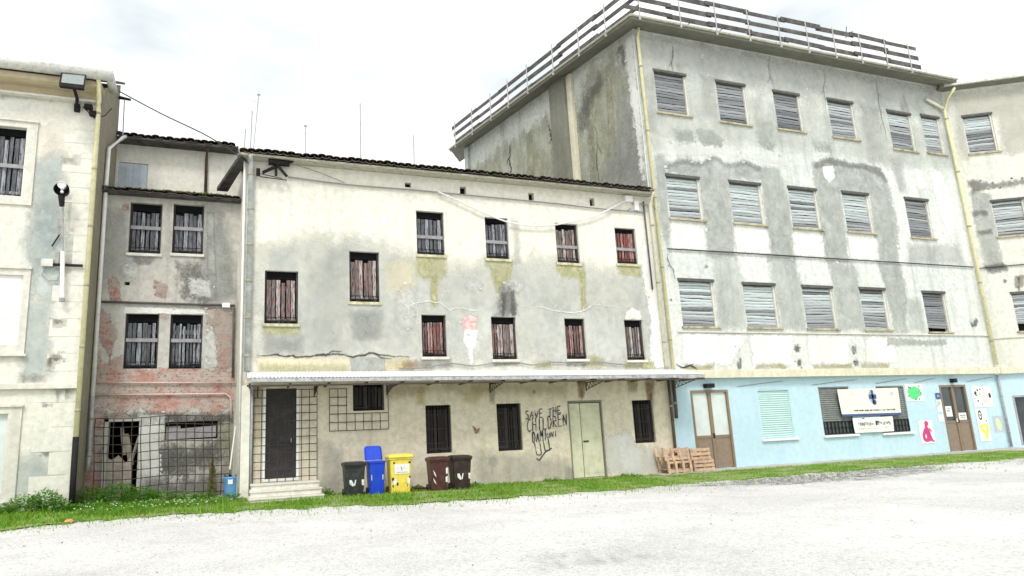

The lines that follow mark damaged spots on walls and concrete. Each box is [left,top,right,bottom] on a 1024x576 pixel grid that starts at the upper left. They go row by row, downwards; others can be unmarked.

water stain [582,46,642,186]
flaking render [84,262,236,499]
crack [257,350,409,359]
water stain [256,237,653,371]